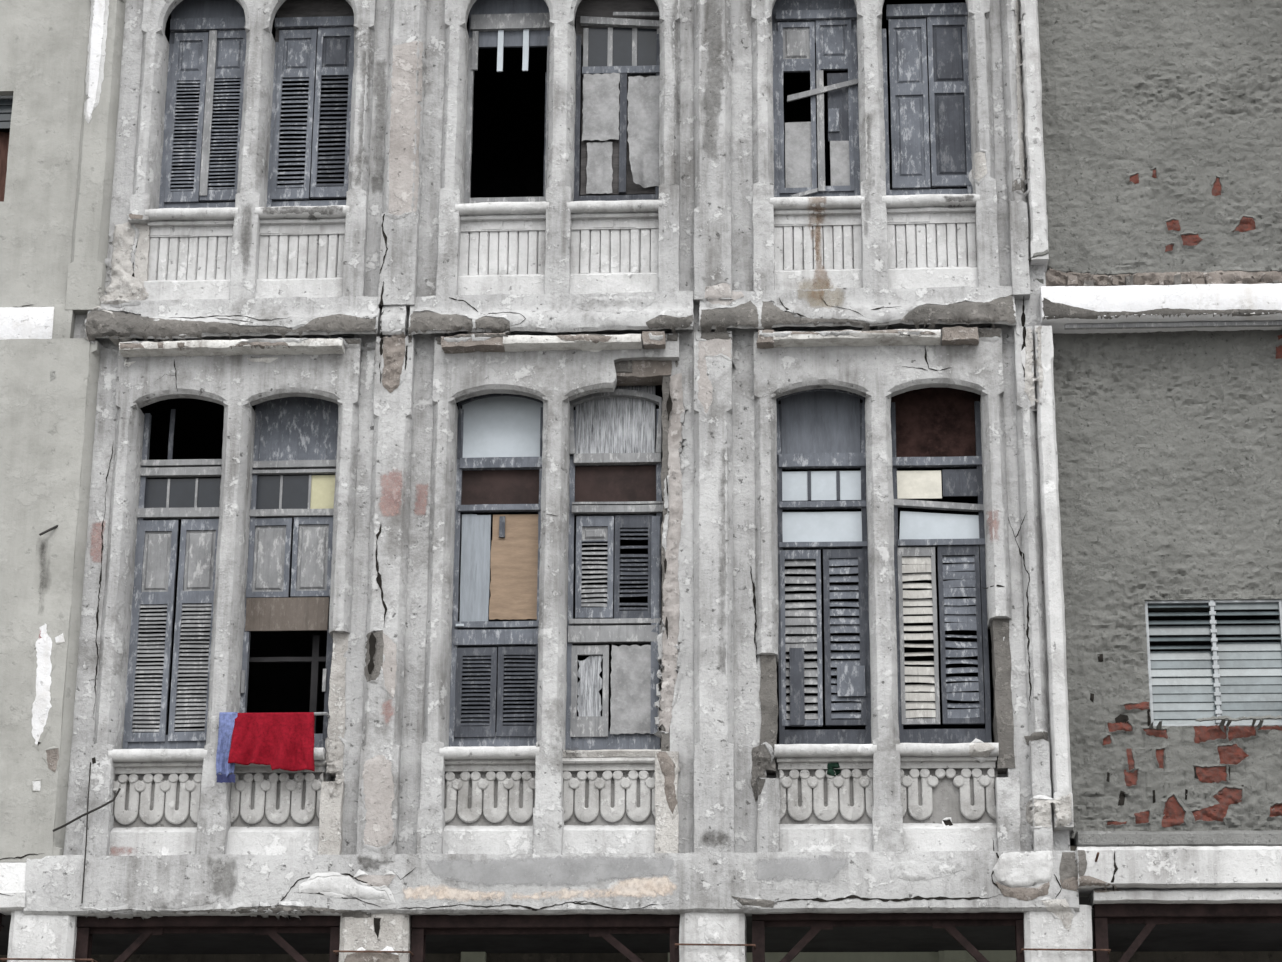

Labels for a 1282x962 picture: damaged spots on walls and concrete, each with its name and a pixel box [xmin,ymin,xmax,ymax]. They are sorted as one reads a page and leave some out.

spalling [1125,166,1160,184]
spalling [1163,217,1203,254]
spalling [1210,175,1224,196]
spalling [1228,214,1256,237]
spalling [84,214,513,393]
spalling [556,334,613,352]
spalling [574,249,1282,833]
crack [368,525,387,674]
peeling [31,624,66,792]
spalling [80,869,675,962]
spalling [995,850,1123,931]